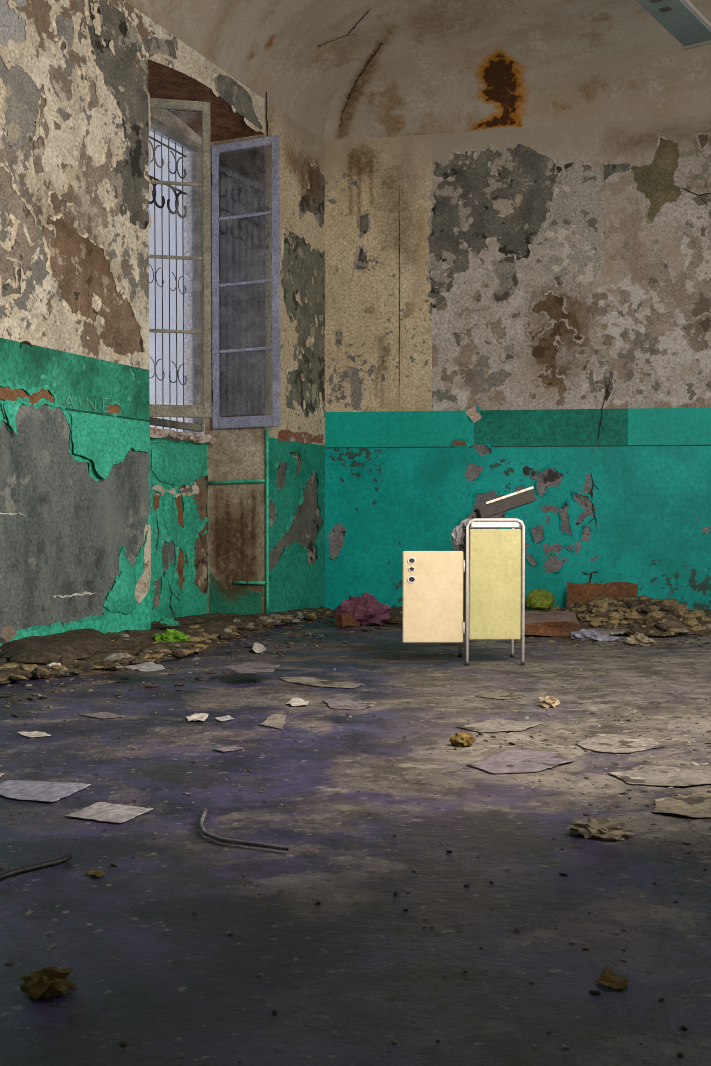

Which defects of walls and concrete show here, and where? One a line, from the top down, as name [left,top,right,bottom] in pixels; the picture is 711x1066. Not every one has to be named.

rust [471,50,525,130]
peeling [0,0,176,361]
peeling [299,160,325,228]
peeling [280,229,343,419]
flaking render [425,132,711,423]
peeling [0,380,263,642]
water stain [213,497,257,597]
peeling [269,429,346,579]
peeling [451,438,599,574]